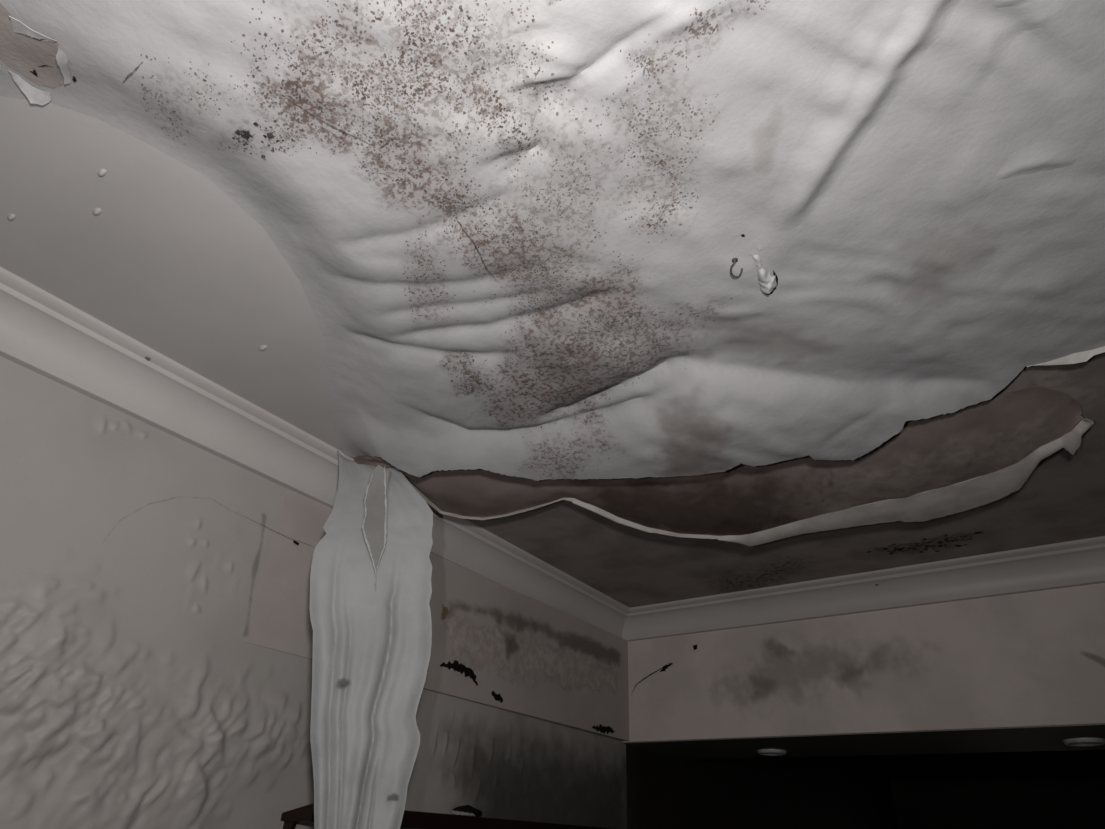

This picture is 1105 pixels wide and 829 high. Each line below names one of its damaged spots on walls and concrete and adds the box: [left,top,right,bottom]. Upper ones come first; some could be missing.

peeling [0,3,76,106]
damp [177,0,733,475]
peeling [467,352,1105,608]